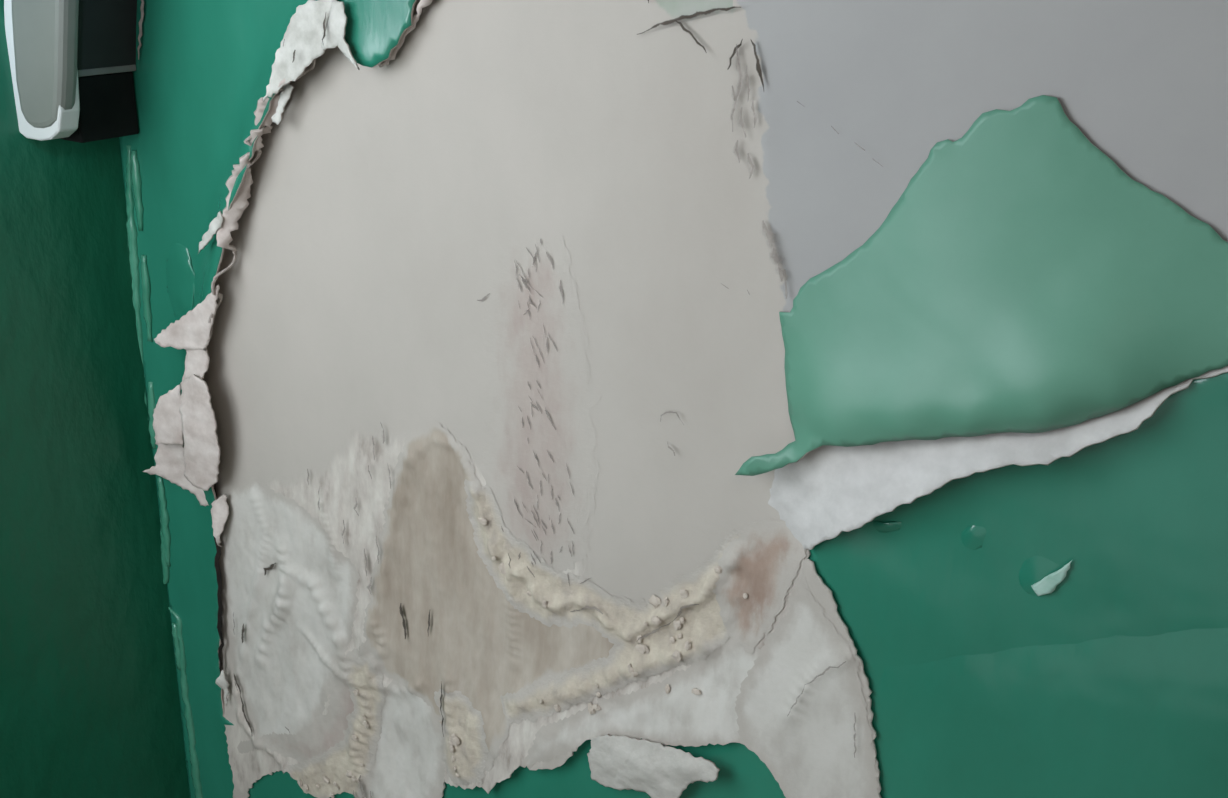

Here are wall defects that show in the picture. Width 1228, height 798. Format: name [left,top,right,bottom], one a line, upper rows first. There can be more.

peeling [143,374,221,506]
peeling [154,284,220,350]
peeling [182,349,210,381]
peeling [216,477,360,798]
spalling [283,653,386,798]
peeling [261,423,429,658]
peeling [198,0,1228,603]
peeling [363,366,1228,798]